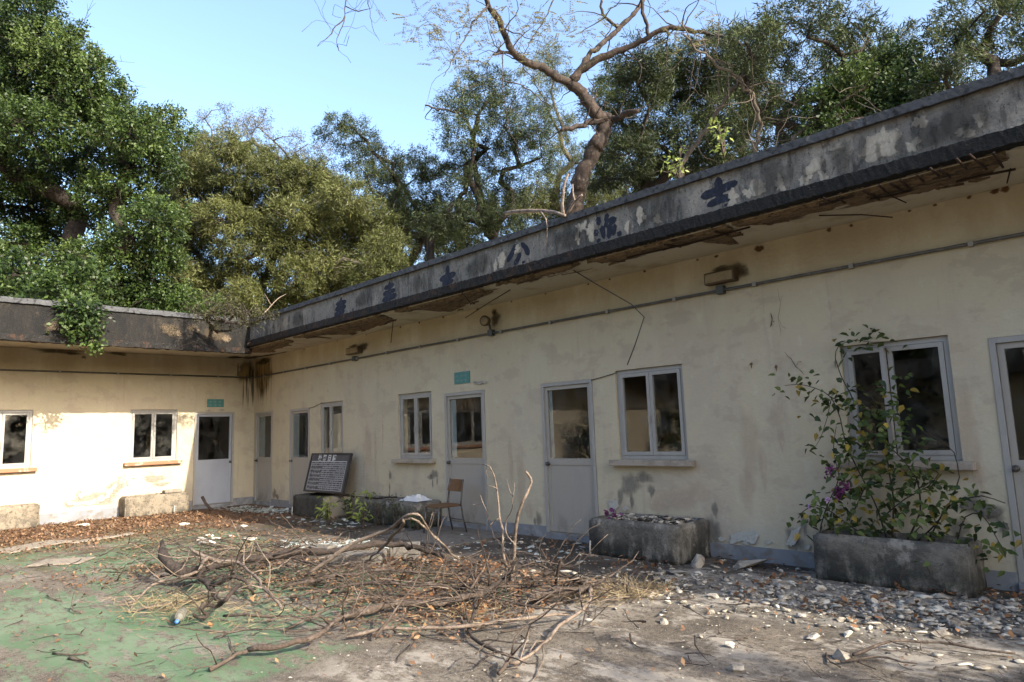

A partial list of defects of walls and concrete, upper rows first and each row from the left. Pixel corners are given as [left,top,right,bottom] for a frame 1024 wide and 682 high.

peeling [860,115,929,163]
peeling [954,112,985,138]
peeling [798,142,844,186]
spalling [251,151,1016,353]
leakage [229,352,285,402]